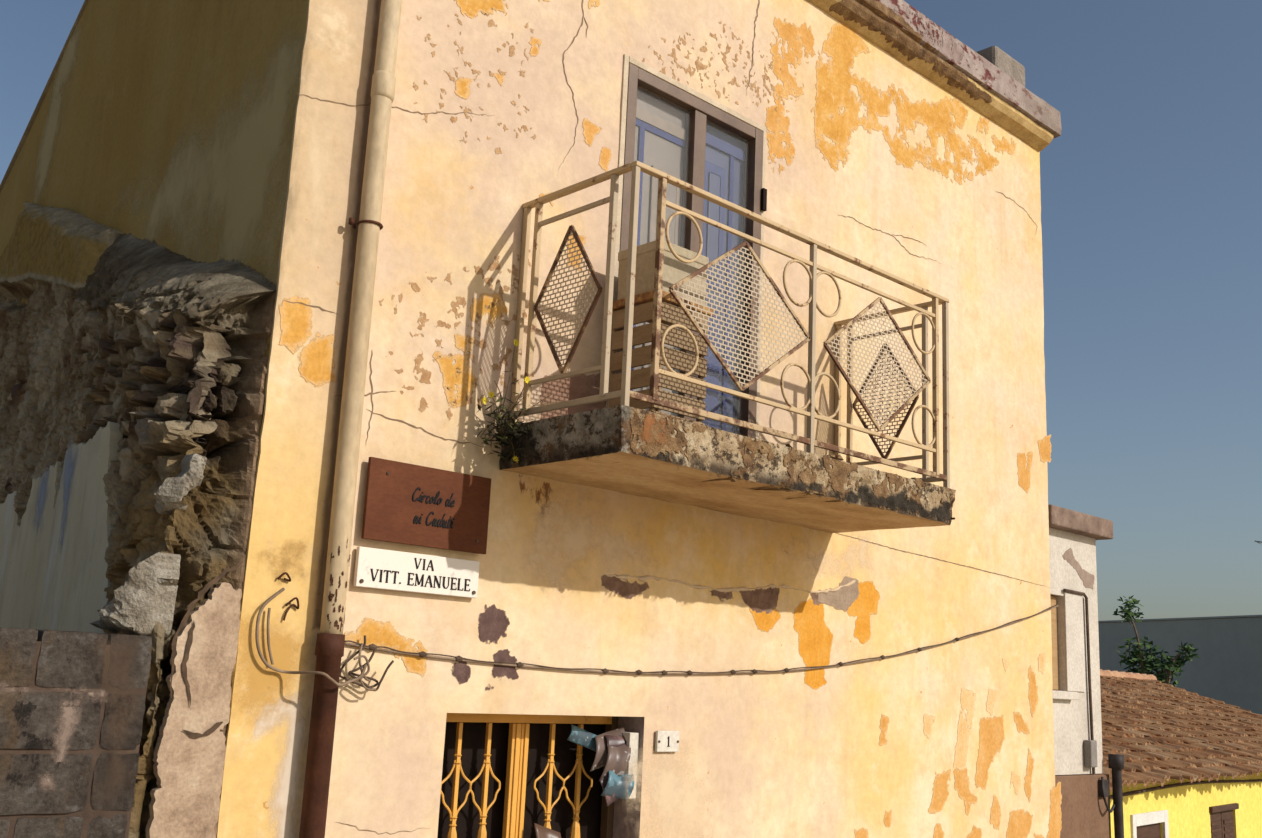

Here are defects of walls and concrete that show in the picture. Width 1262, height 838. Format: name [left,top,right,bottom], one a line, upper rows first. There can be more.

peeling [456,0,509,19]
crack [297,93,492,116]
crack [559,0,588,168]
peeling [765,0,1017,185]
peeling [279,296,337,387]
water stain [499,424,556,465]
mould [768,482,955,521]
flaking render [601,574,649,599]
flaking render [452,661,471,684]
flaking render [478,604,519,690]
peeling [710,576,880,689]
peeling [928,653,1062,838]